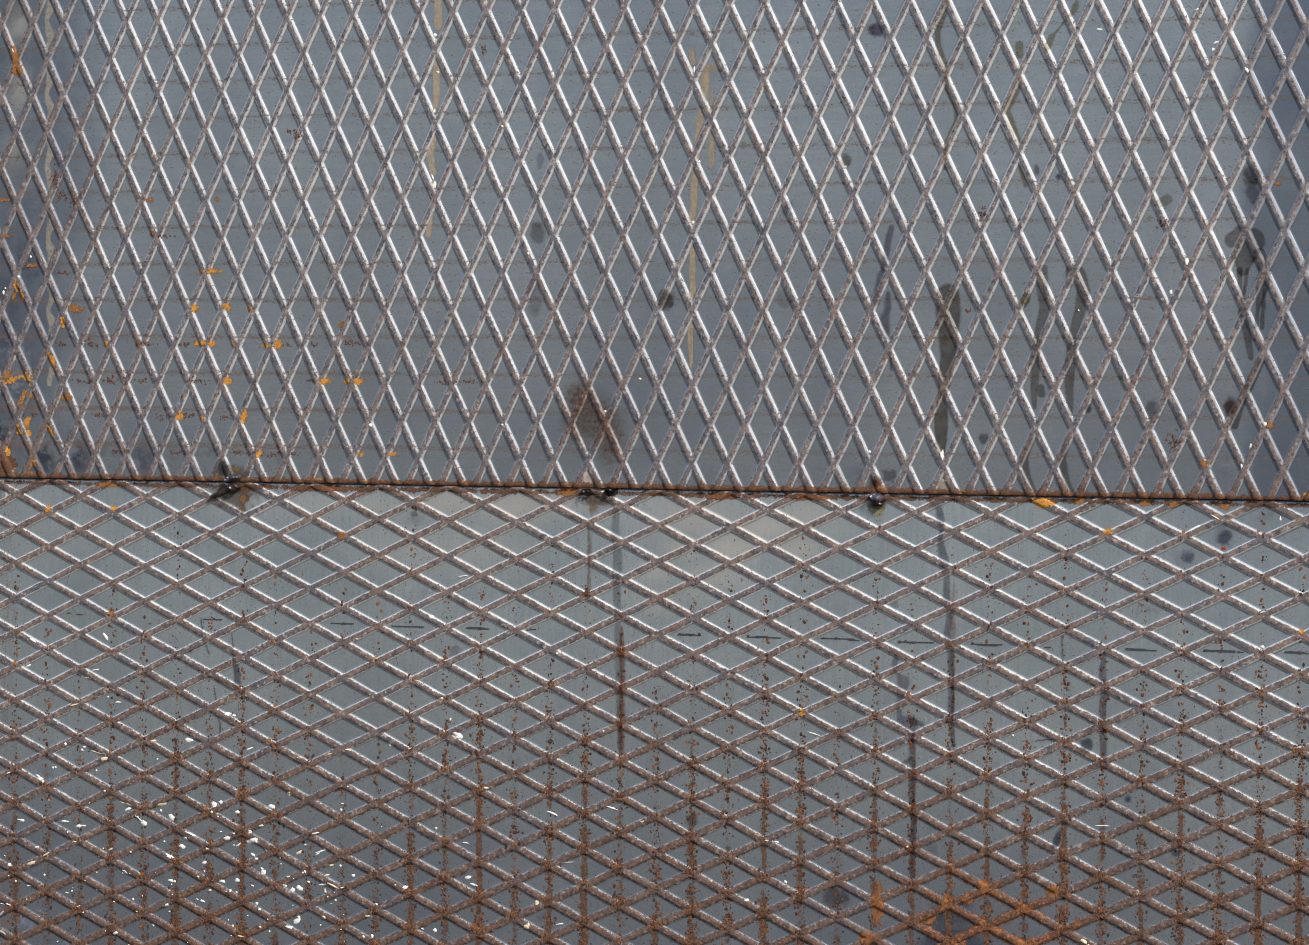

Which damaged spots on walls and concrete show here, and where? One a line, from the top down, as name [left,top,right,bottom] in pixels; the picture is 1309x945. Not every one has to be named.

rust [12,263,37,301]
rust [46,305,84,367]
rust [262,340,292,350]
rust [0,371,1309,945]